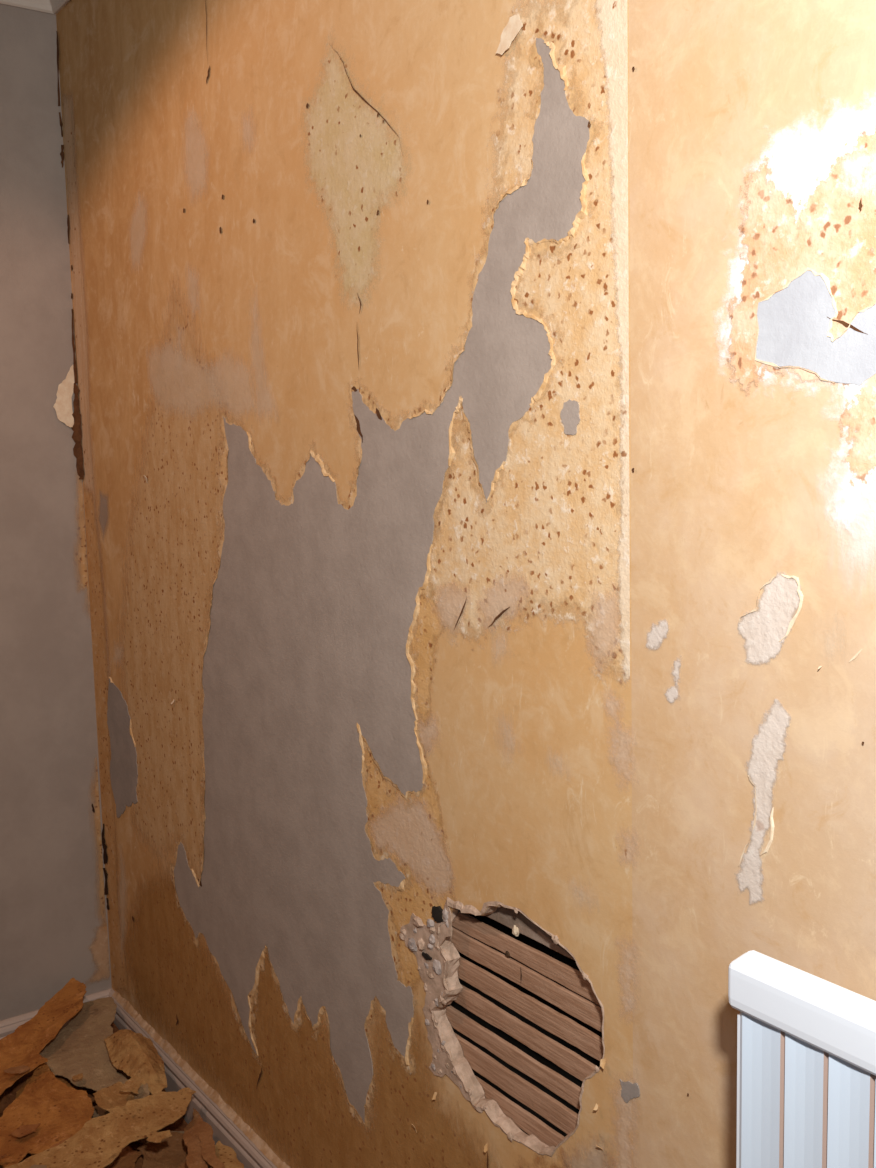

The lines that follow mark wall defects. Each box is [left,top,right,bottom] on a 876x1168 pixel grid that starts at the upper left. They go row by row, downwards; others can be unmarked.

peeling [495,15,523,55]
crack [332,47,402,150]
spalling [720,108,876,559]
peeling [53,365,75,427]
peeling [170,23,606,1157]
peeling [646,620,668,650]
peeling [738,573,804,664]
peeling [737,699,791,904]